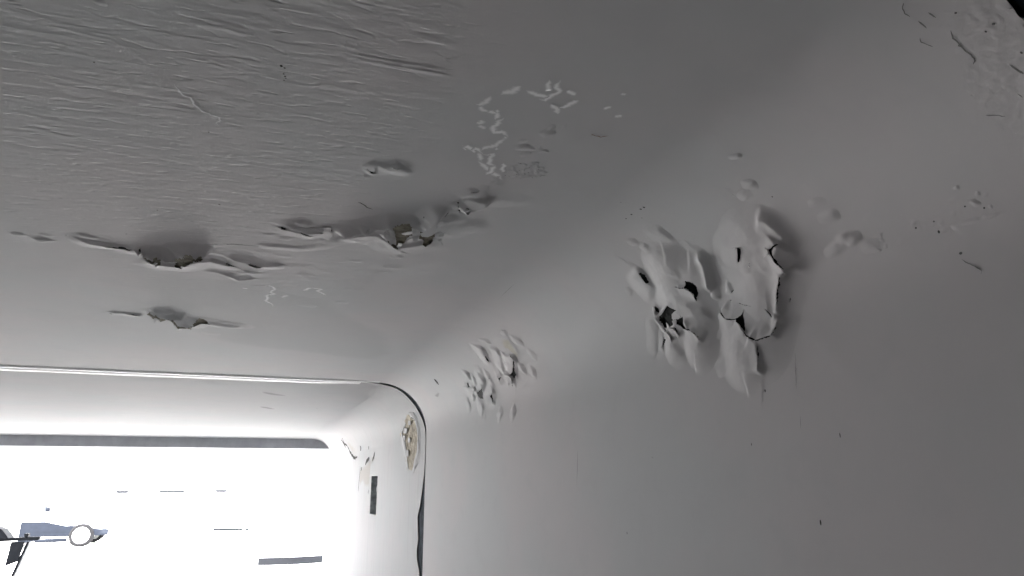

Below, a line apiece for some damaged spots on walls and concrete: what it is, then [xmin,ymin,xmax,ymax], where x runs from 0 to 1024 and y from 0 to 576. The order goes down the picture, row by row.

peeling [66,188,535,286]
peeling [101,307,256,335]
peeling [613,204,814,412]
peeling [458,330,545,427]
spalling [400,412,421,474]